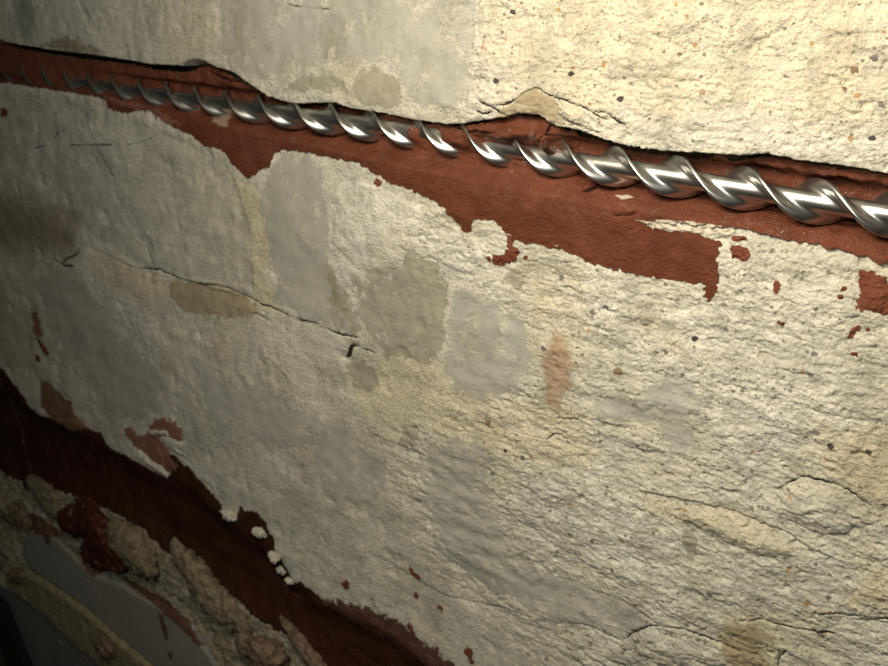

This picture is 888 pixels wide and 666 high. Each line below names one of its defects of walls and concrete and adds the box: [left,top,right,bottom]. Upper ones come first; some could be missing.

crack [211,72,248,83]
crack [457,87,625,143]
peeling [555,100,602,132]
peeling [331,180,491,277]
crack [142,268,372,358]
peeling [149,430,188,458]
peeling [133,449,169,479]